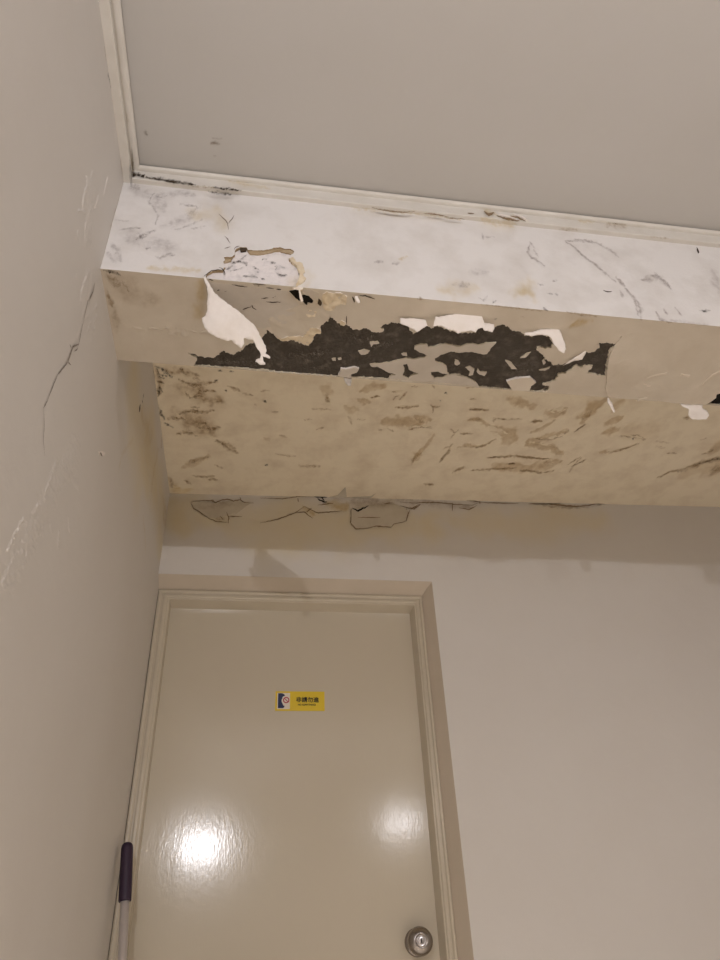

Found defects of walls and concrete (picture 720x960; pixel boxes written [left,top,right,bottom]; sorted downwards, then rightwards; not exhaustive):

water stain [130,155,194,185]
crack [43,285,95,453]
spalling [193,248,720,420]